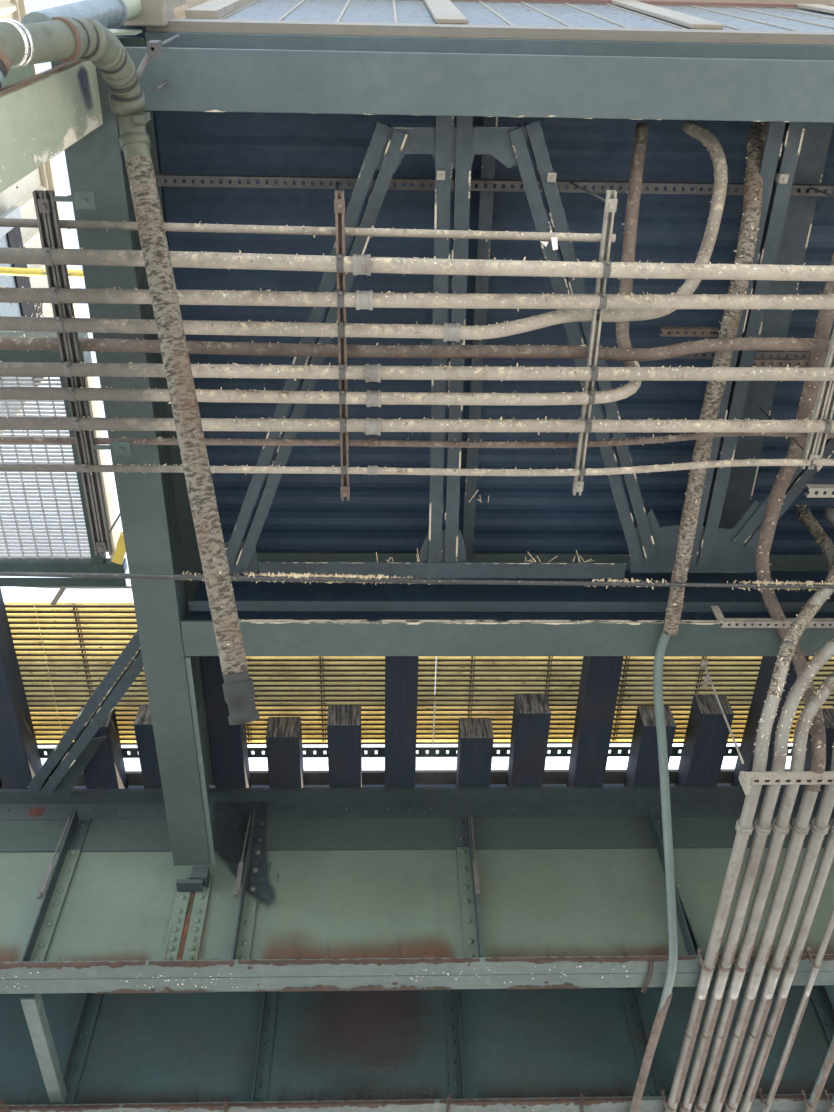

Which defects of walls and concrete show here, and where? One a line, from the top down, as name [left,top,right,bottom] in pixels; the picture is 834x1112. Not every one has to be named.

corrosion [264,943,452,959]
peeling [0,955,755,970]
peeling [252,983,462,992]
corrosion [325,990,416,1067]
peeling [0,1097,633,1112]